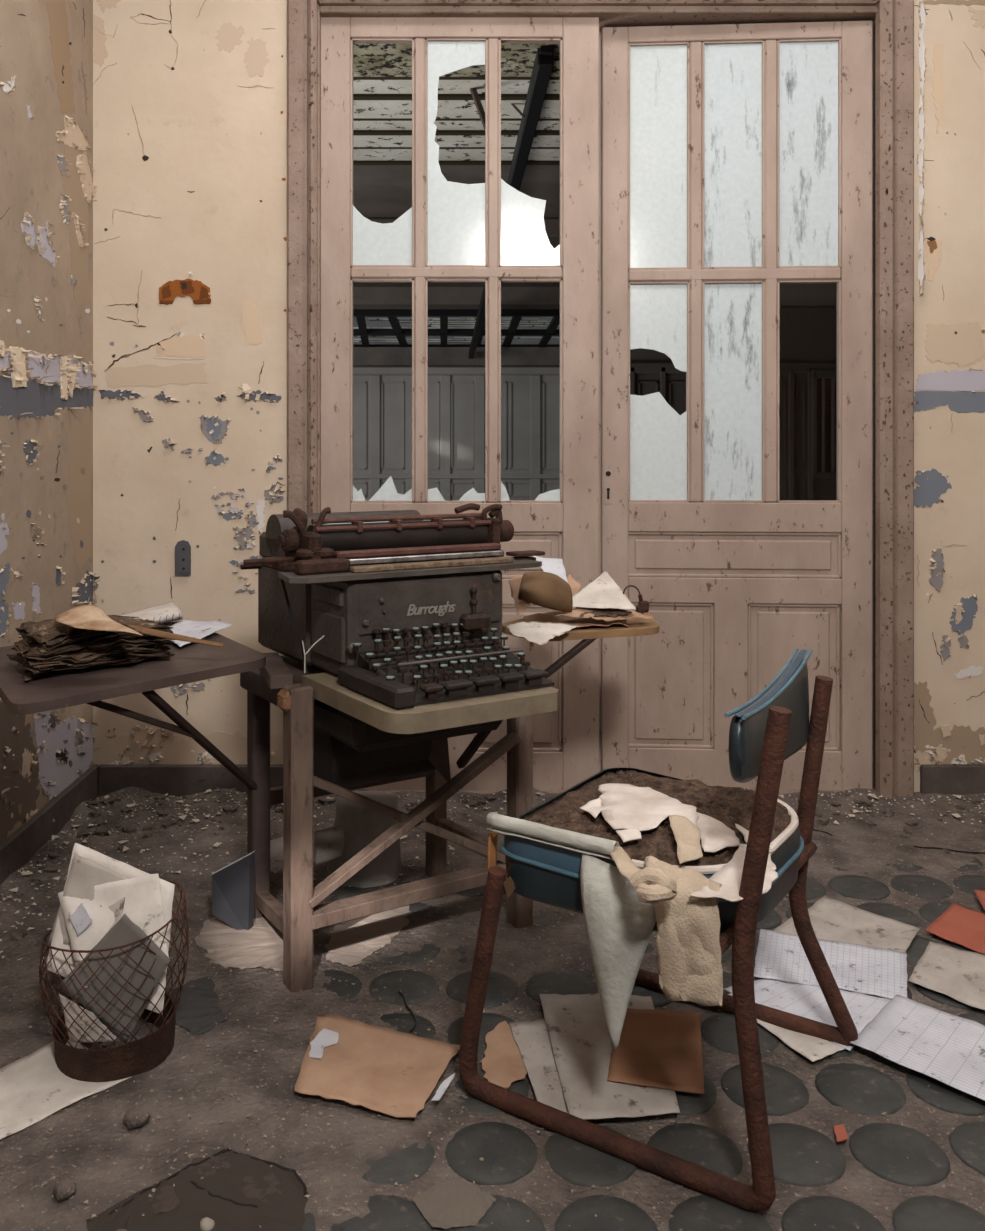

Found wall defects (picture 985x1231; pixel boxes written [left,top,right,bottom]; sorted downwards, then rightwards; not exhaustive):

crack [73,0,206,85]
crack [914,5,985,69]
peeling [15,115,98,268]
crack [104,272,178,372]
rust [159,279,211,305]
peeling [147,400,231,466]
peeling [882,369,985,439]
peeling [903,460,952,508]
peeling [211,454,285,594]
peeling [56,555,104,606]
peeling [940,594,978,662]
peeling [0,710,247,960]